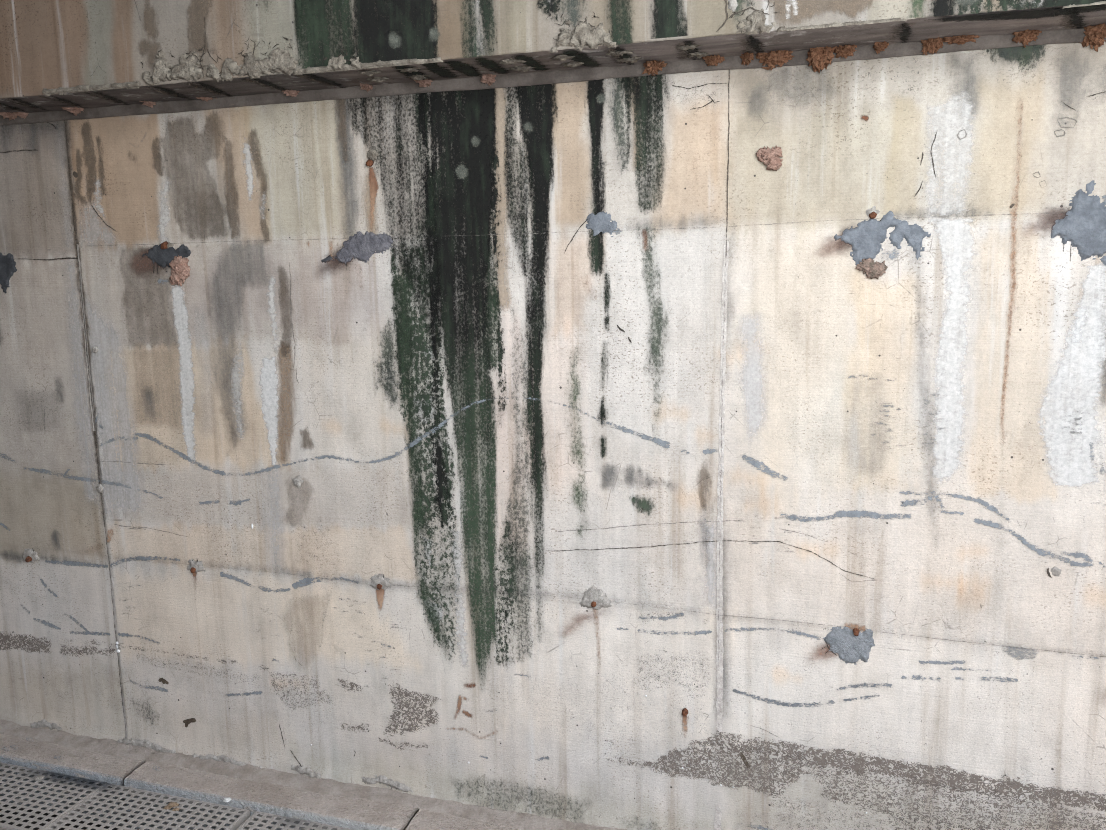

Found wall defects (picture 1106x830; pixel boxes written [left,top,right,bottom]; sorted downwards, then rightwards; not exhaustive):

leakage [353,0,508,80]
leakage [155,276,195,463]
leakage [153,118,267,243]
leakage [259,270,313,465]
rust [365,168,379,232]
leakage [295,0,460,660]
leakage [484,84,558,663]
leakage [588,229,604,275]
leakage [643,227,668,401]
leakage [927,80,974,480]
leakage [1038,265,1106,487]
leakage [608,744,1106,830]